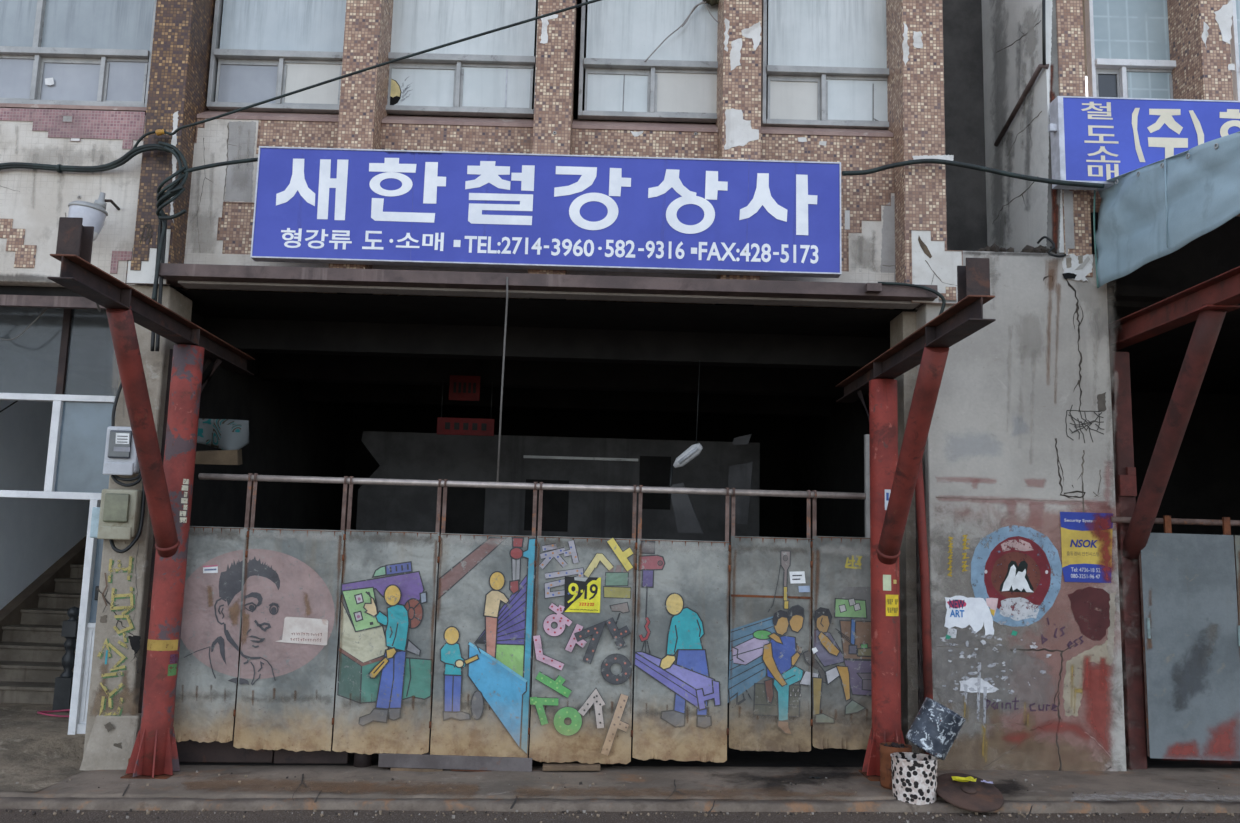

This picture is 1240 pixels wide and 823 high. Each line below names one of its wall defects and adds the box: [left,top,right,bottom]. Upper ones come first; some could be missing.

spalling [724,18,761,70]
spalling [724,108,759,150]
crack [1043,274,1083,412]